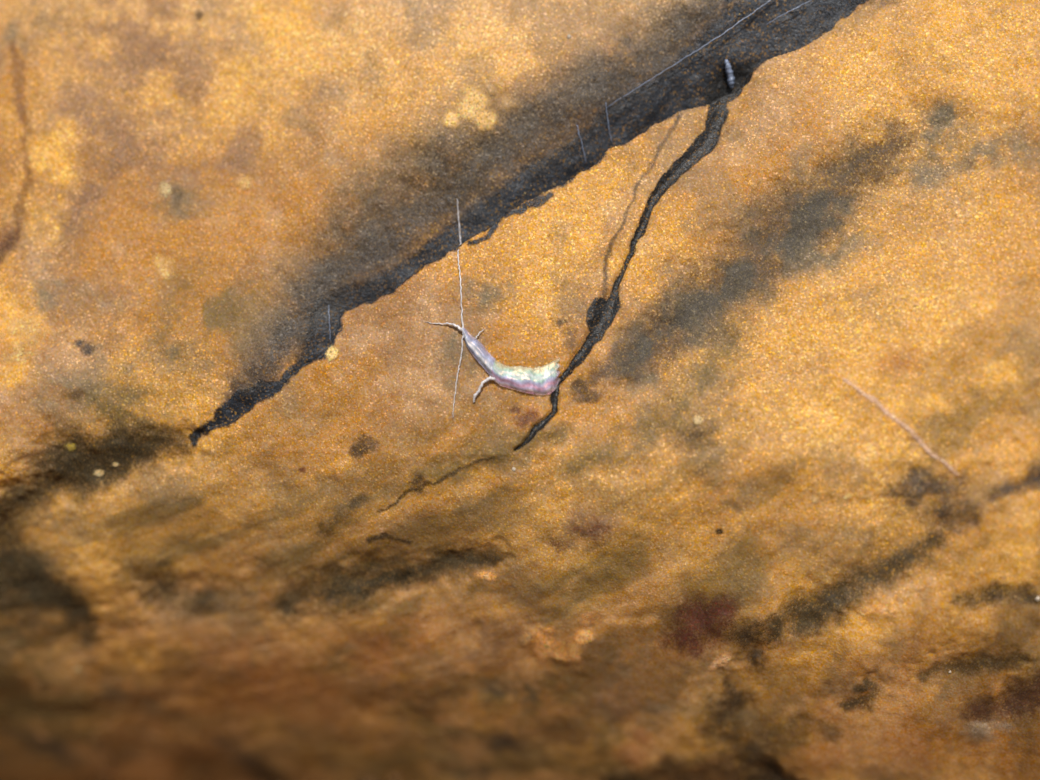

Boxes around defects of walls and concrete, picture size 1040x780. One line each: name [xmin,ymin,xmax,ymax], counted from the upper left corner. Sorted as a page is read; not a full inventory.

crack [189,0,887,451]
water stain [574,137,903,402]
water stain [0,429,188,641]
crack [367,459,490,544]